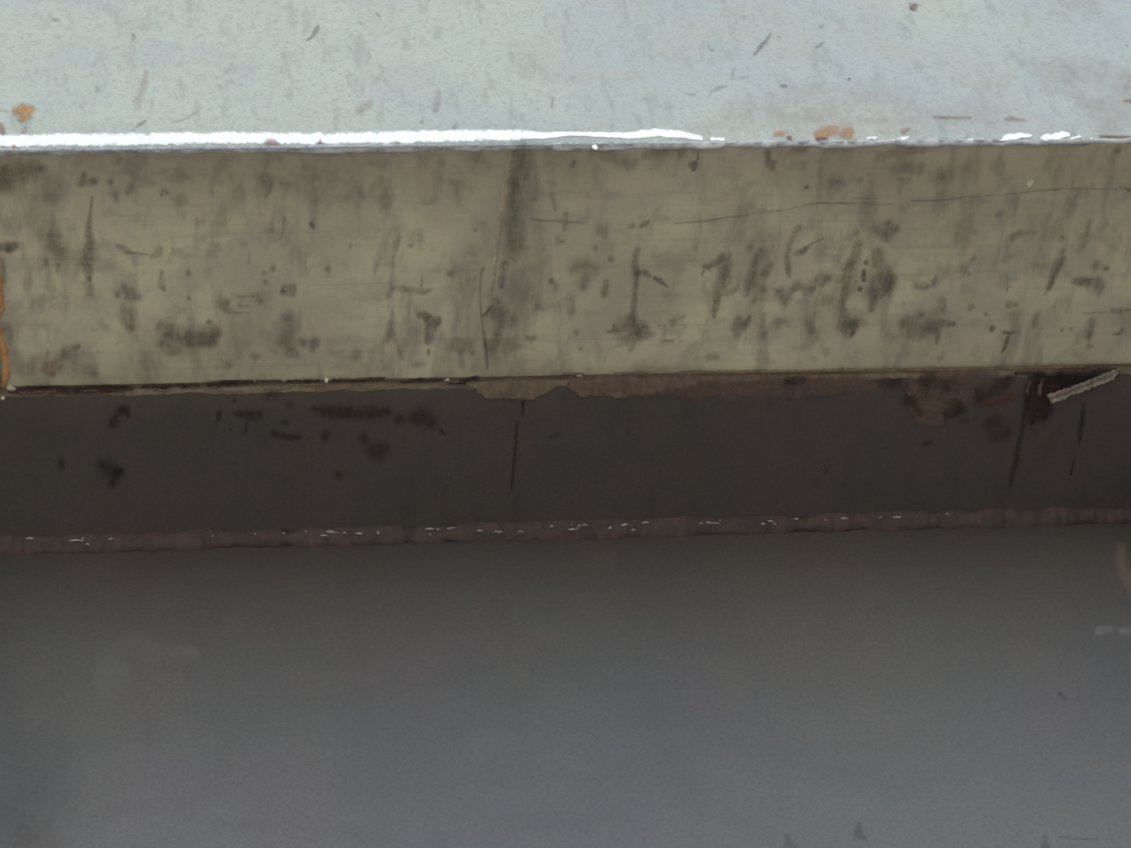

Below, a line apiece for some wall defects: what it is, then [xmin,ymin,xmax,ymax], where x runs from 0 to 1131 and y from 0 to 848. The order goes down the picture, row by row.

peeling [445,365,1085,399]